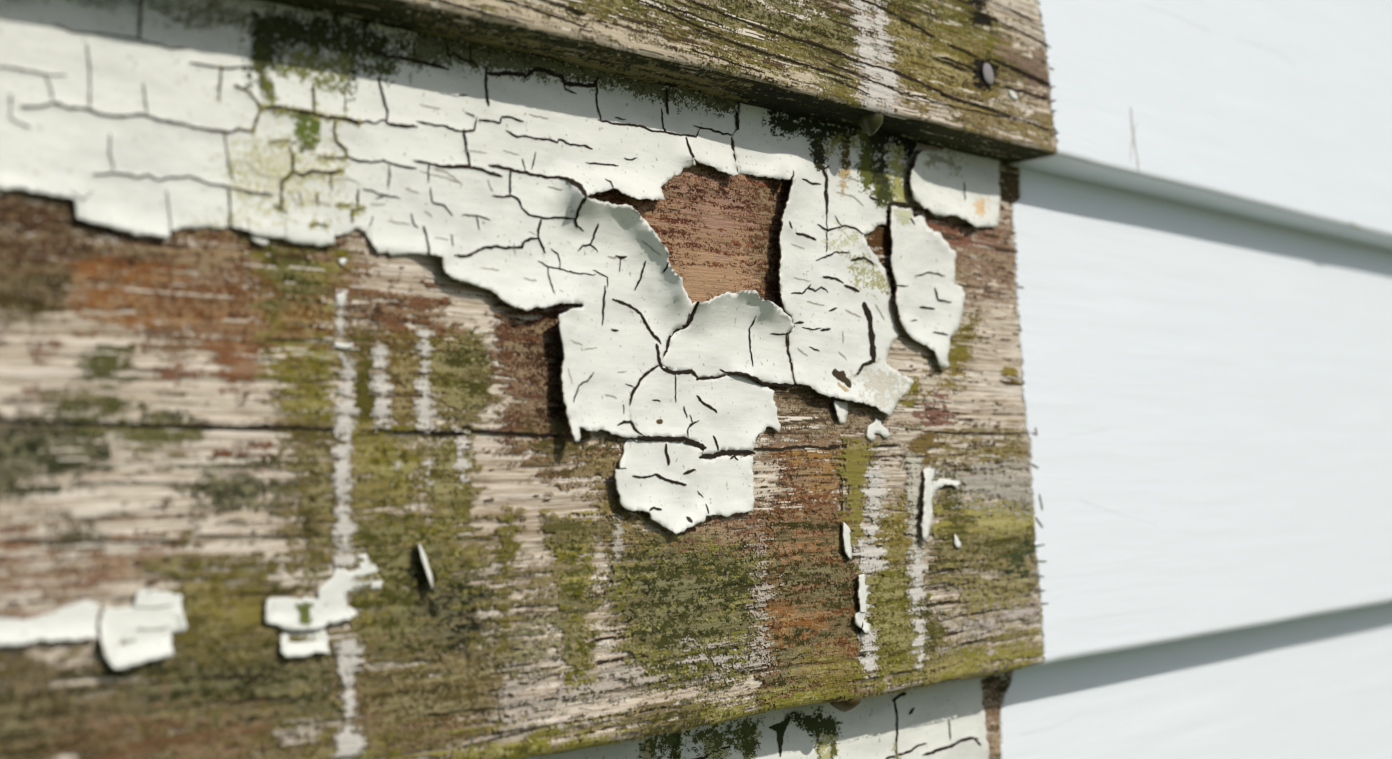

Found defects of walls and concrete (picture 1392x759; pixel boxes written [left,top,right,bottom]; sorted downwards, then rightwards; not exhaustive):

crack [438,0,587,28]
crack [639,0,1054,131]
peeling [0,0,1001,544]
damp [0,189,394,568]
crack [0,394,568,438]
damp [413,328,473,489]
damp [483,294,627,496]
crack [754,430,1029,522]
peeling [0,589,187,670]
peeling [264,553,383,658]
damp [0,374,1043,759]
peeling [521,675,989,759]